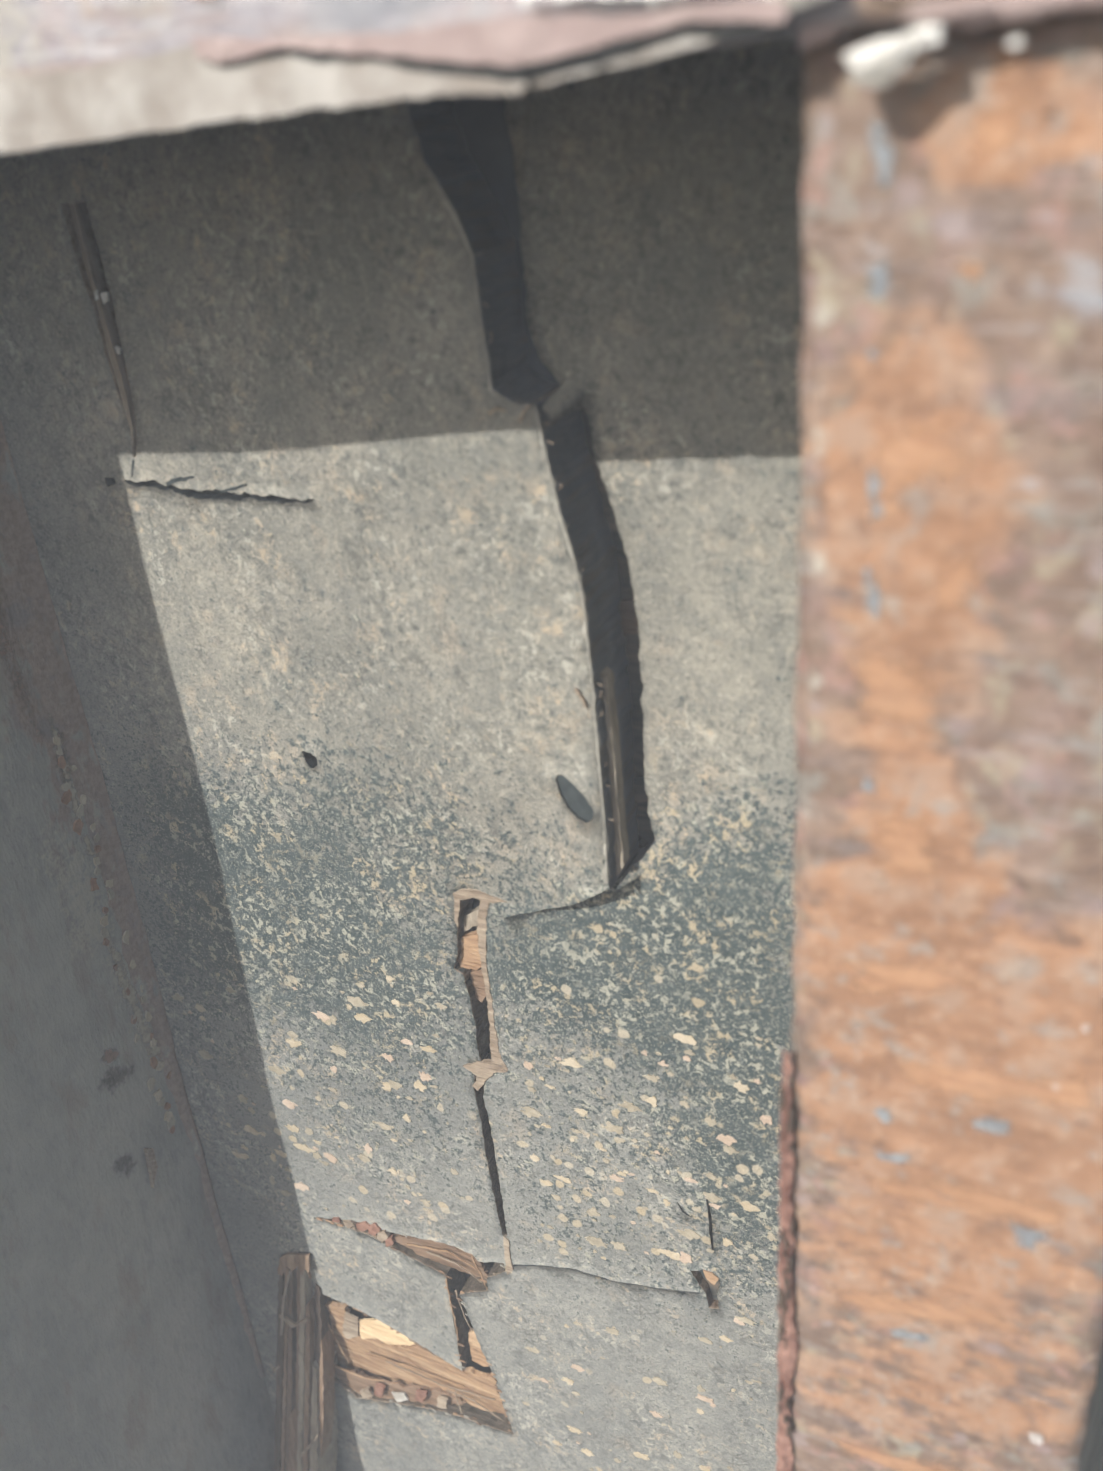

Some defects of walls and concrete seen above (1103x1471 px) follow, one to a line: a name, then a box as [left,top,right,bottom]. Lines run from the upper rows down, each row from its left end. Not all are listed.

crack [62,201,314,504]
crack [406,93,655,888]
corrosion [843,961,968,994]
peeling [311,983,372,1025]
peeling [286,1031,302,1048]
crack [453,888,525,1275]
corrosion [903,1059,1092,1109]
spalling [231,1034,513,1433]
crack [678,1203,714,1249]
corrosion [872,1177,1062,1226]
corrosion [776,1048,798,1471]
corrosion [835,1439,958,1471]